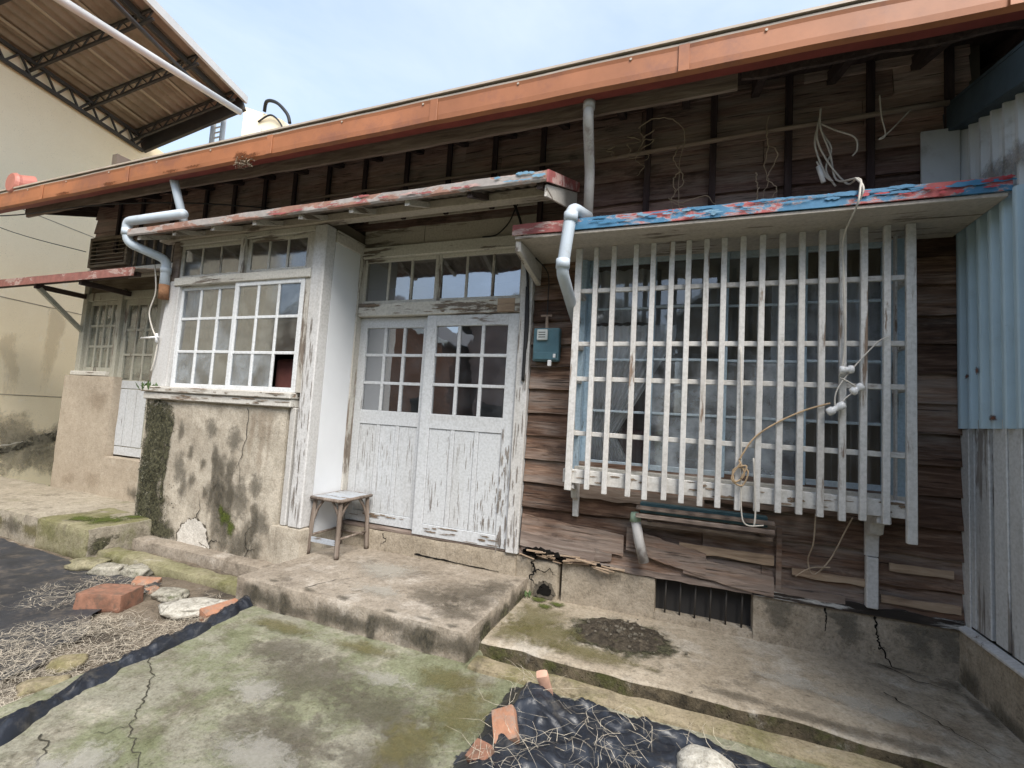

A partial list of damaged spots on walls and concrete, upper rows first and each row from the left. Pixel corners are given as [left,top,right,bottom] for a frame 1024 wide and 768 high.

peeling [353,191,431,203]
peeling [494,171,545,182]
peeling [588,206,723,223]
peeling [735,174,1017,210]
water stain [0,419,58,472]
water stain [130,404,268,559]
peeling [349,425,404,520]
peeling [424,414,523,553]
flaking render [176,500,220,549]
crack [529,561,553,583]
crack [873,616,987,751]
crack [93,657,155,768]